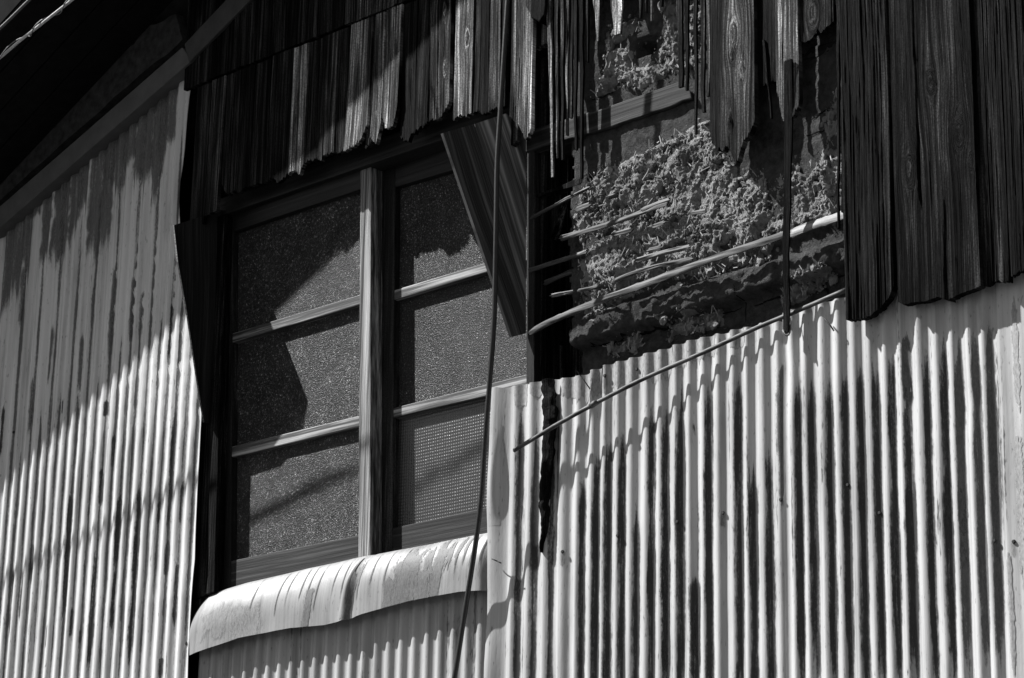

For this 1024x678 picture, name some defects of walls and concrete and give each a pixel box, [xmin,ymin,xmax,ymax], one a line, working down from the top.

spalling [591,0,707,97]
spalling [573,87,841,322]
peeling [514,381,542,408]
peeling [561,304,744,405]
damp [776,365,784,506]
damp [900,335,913,453]
damp [957,486,969,567]